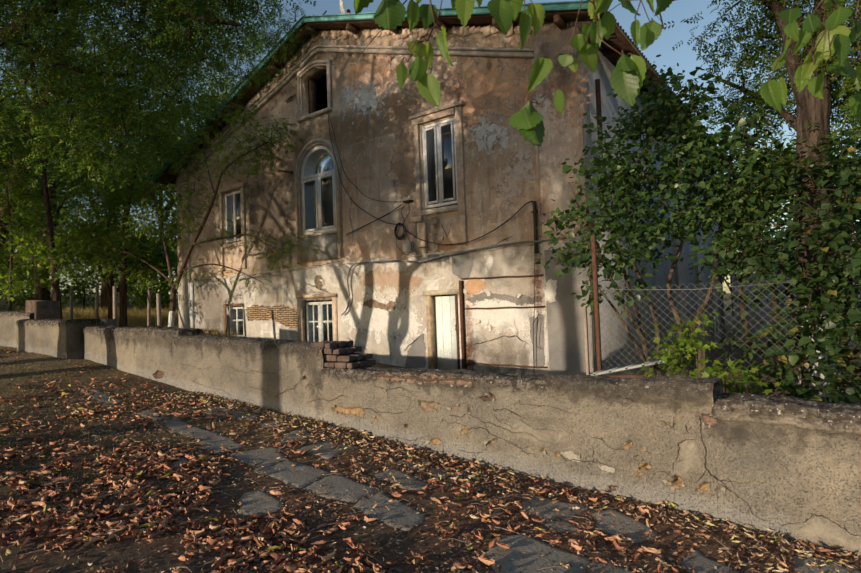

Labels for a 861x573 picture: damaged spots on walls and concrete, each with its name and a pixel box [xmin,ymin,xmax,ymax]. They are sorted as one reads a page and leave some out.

peeling [336,41,402,129]
peeling [445,33,593,160]
flaking render [244,275,338,328]
peeling [341,266,427,345]
peeling [463,276,557,342]
crack [442,387,564,457]
crack [558,437,637,473]
crack [659,415,859,536]